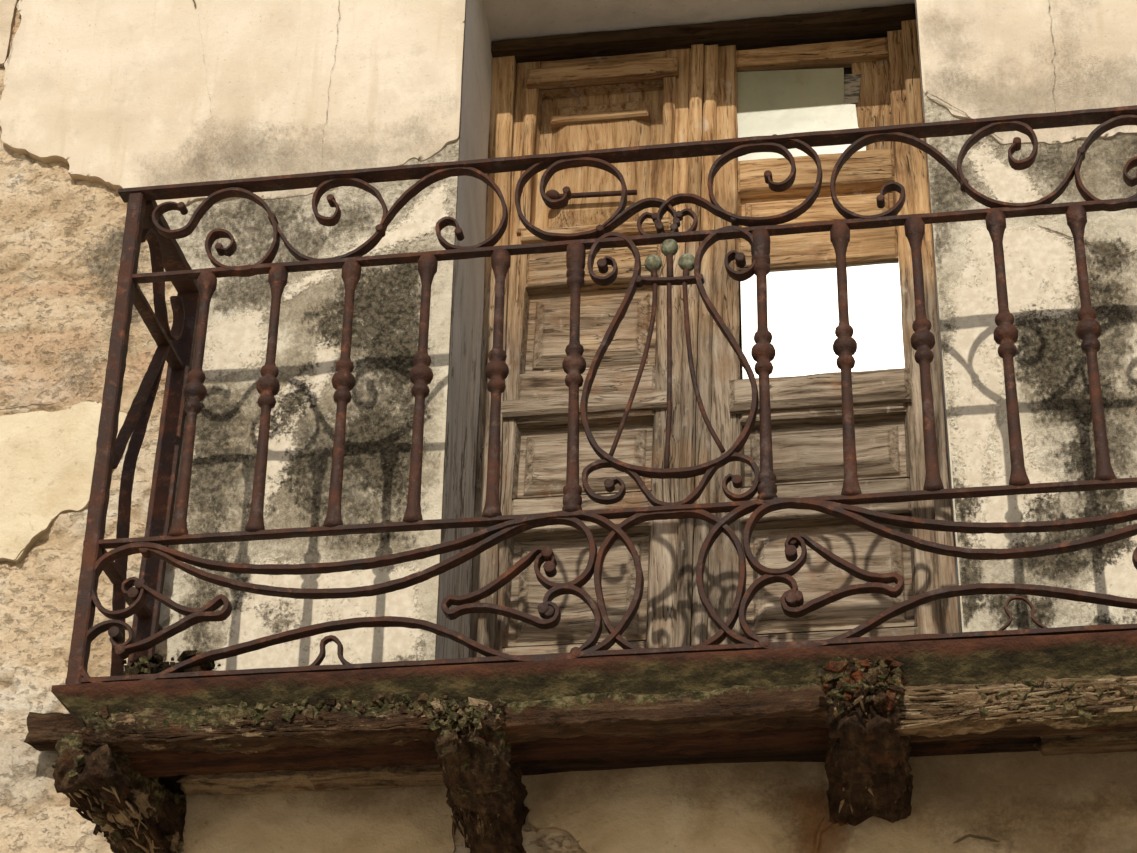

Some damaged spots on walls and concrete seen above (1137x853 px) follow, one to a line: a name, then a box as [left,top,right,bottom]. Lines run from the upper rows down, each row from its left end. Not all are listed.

peeling [282,184,450,301]
leakage [929,158,976,292]
leakage [1017,133,1137,196]
peeling [202,307,268,382]
spalling [0,127,134,853]
spalling [104,240,177,587]
peeling [243,337,341,522]
leakage [177,195,435,655]
leakage [952,237,1137,630]
spalling [155,562,177,662]
peeling [211,554,426,671]
spalling [522,802,585,853]